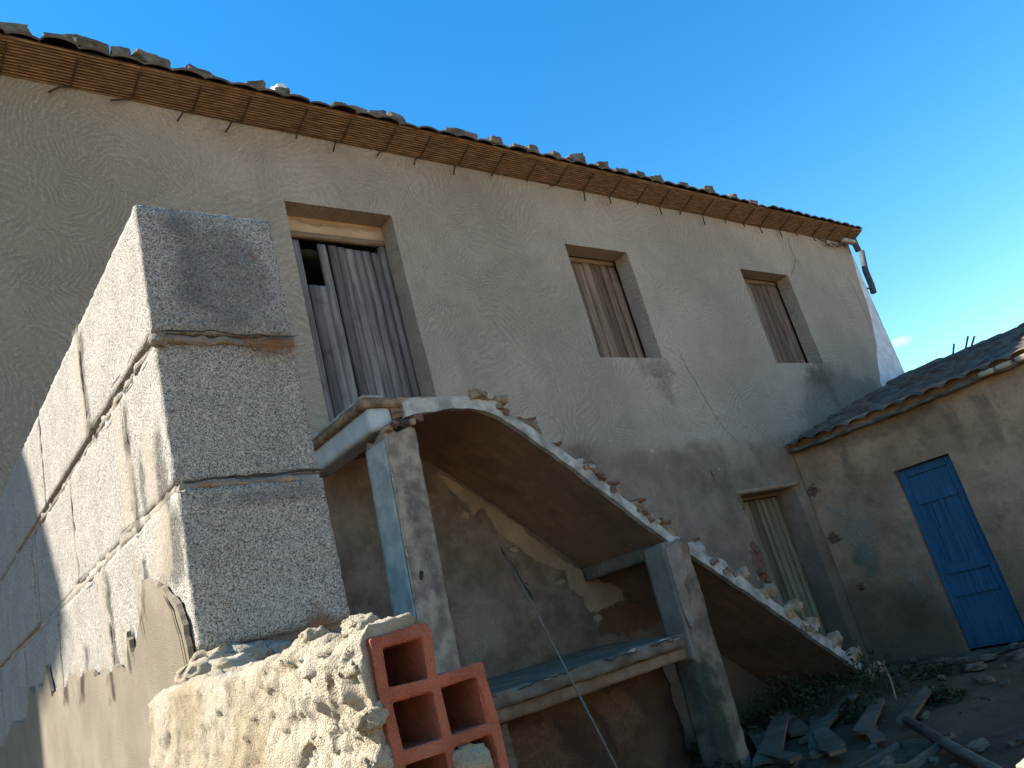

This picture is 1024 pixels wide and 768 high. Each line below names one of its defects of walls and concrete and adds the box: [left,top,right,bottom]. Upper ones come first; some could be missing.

spalling [468,389,510,415]
spalling [576,458,618,494]
spalling [636,507,665,525]
flaking render [437,472,623,623]